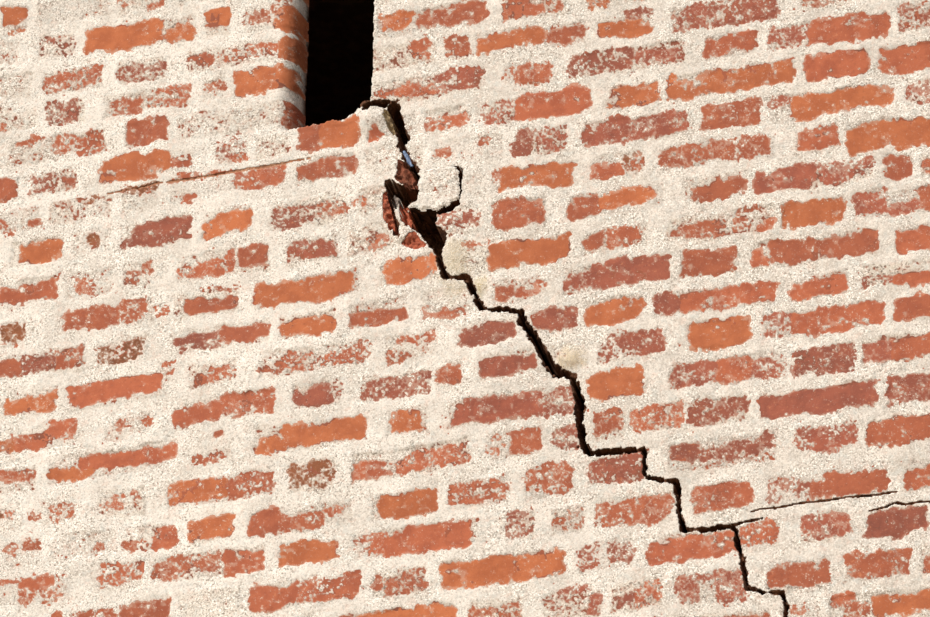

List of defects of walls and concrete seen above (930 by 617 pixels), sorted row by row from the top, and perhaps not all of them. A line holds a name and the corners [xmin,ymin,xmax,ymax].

crack [107,157,311,195]
crack [360,99,930,617]